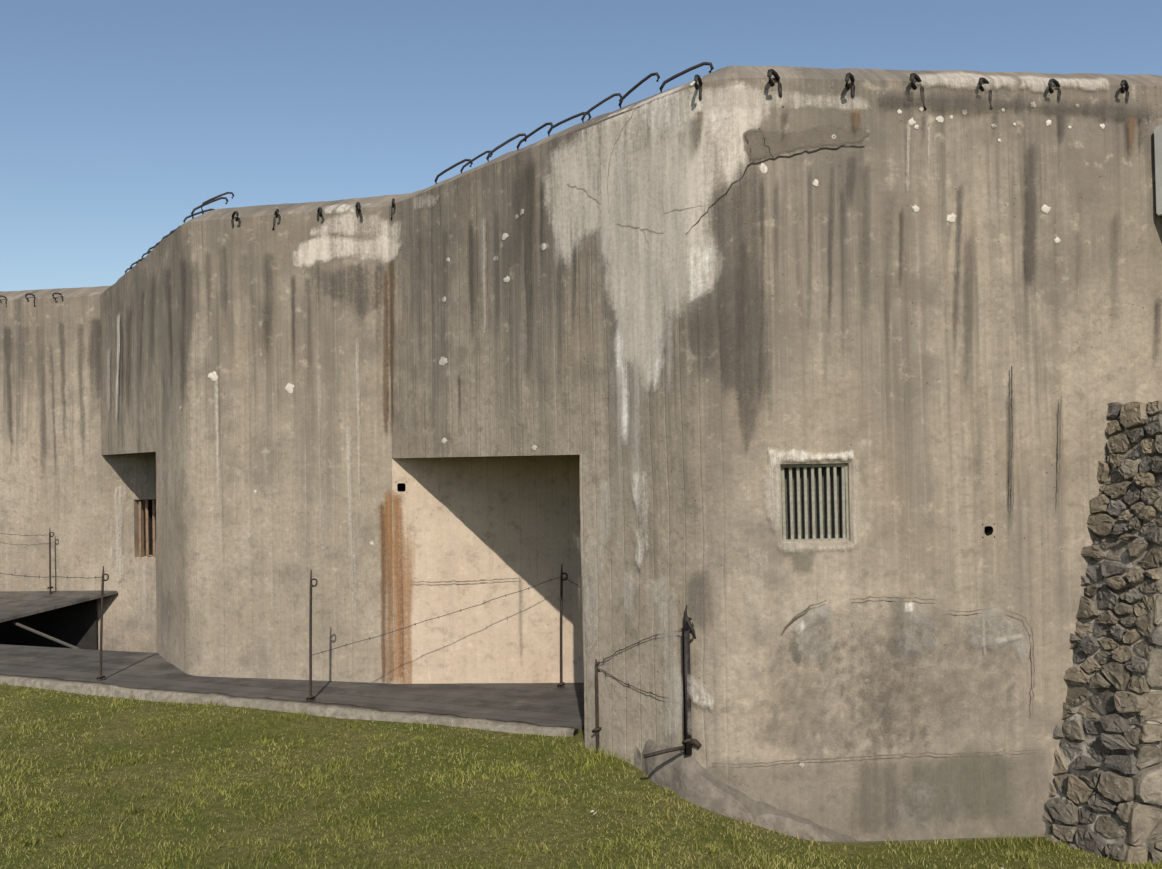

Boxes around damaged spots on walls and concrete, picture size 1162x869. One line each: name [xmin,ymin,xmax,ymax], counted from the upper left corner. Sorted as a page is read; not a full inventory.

leakage [469,212,498,329]
peeling [540,77,869,534]
crack [567,108,864,238]
leakage [955,187,973,350]
leakage [881,73,1157,149]
leakage [1026,144,1038,277]
rust [381,491,411,684]